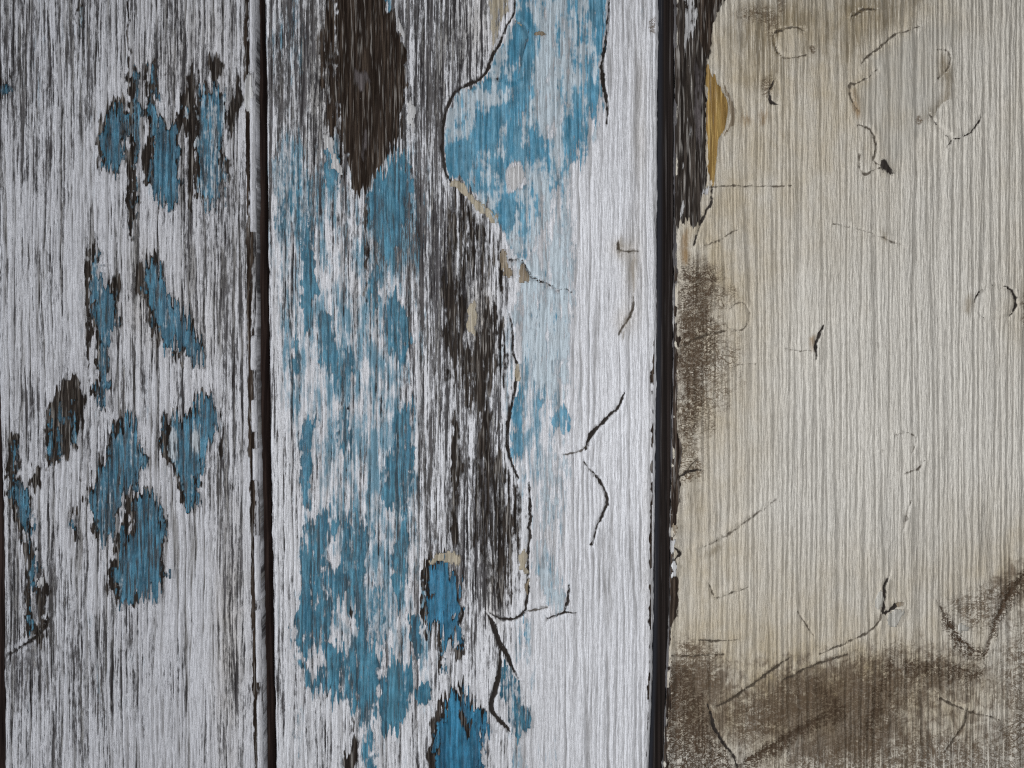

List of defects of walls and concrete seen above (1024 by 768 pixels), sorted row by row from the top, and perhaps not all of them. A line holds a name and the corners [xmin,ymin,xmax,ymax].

peeling [675,0,735,228]
crack [762,77,778,105]
crack [917,50,980,145]
peeling [4,239,224,649]
peeling [95,0,260,768]
peeling [271,0,610,768]
crack [490,319,533,620]
crack [564,392,625,545]
water stain [675,264,734,463]
crack [717,578,905,706]
water stain [666,571,1024,768]